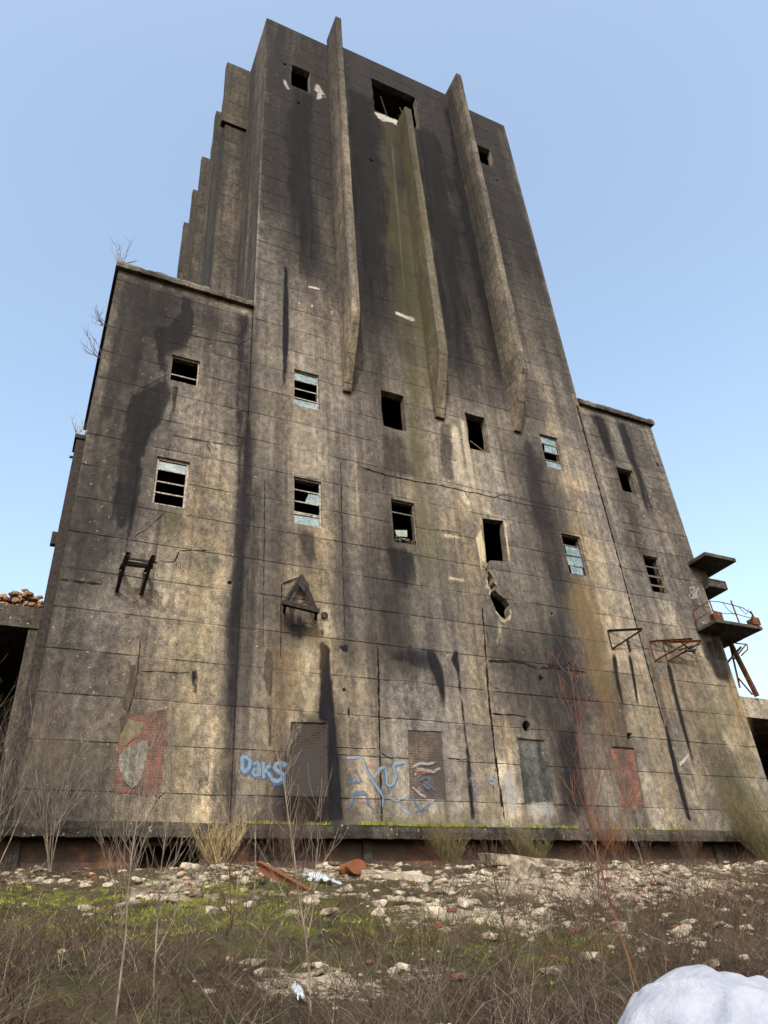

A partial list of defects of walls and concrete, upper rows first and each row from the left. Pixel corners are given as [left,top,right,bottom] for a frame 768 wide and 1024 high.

water stain [288,92,312,253]
water stain [112,297,194,536]
crack [134,512,206,570]
crack [340,461,554,645]
water stain [594,415,649,507]
crack [481,608,587,820]
water stain [665,726,691,820]